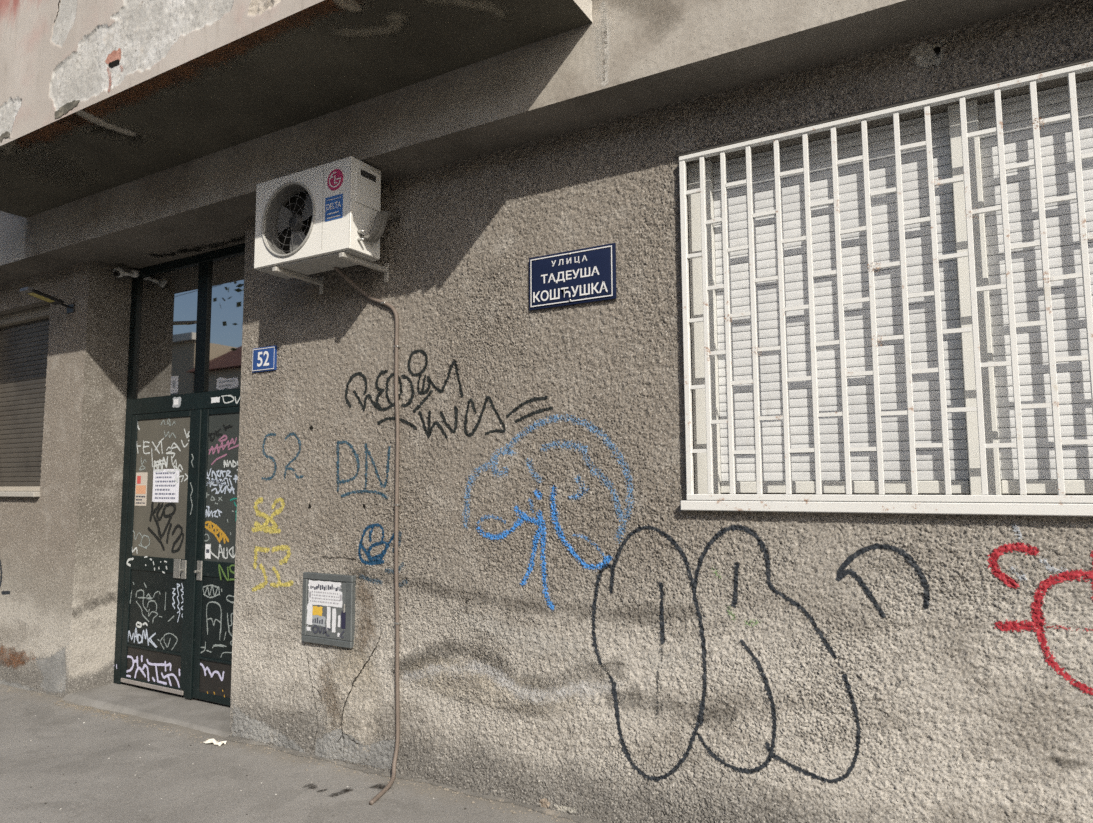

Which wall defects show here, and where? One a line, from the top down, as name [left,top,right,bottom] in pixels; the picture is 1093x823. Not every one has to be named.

peeling [0,97,22,142]
peeling [49,0,234,141]
crack [304,627,382,761]